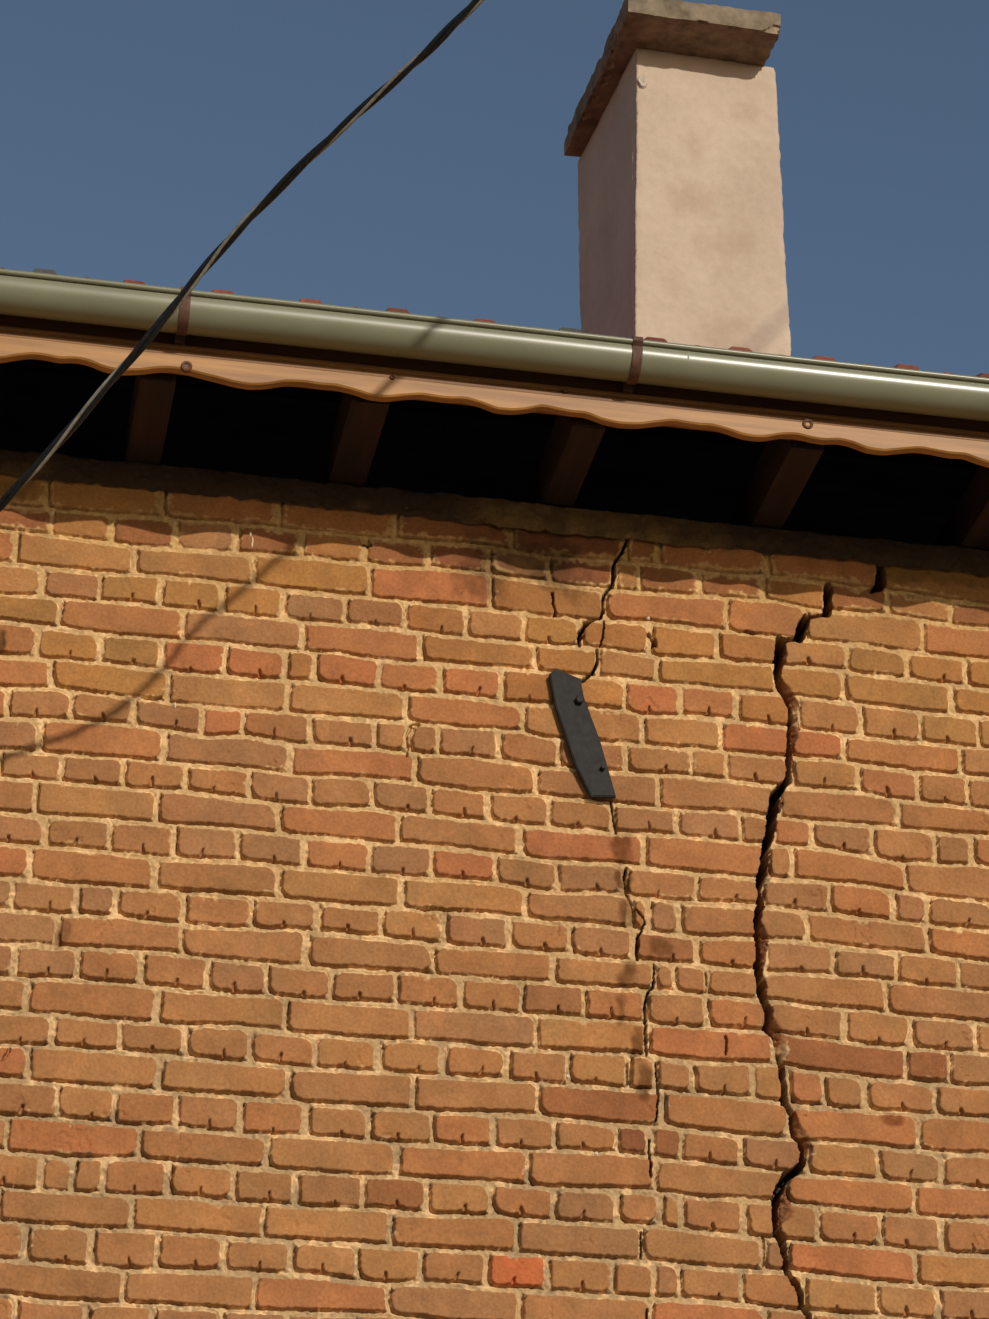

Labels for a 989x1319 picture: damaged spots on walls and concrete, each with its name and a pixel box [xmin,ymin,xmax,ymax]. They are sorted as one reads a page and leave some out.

crack [551,539,628,683]
crack [868,564,887,594]
crack [609,798,617,835]
crack [752,582,834,1319]
crack [622,867,660,1179]
crack [637,1231,645,1260]